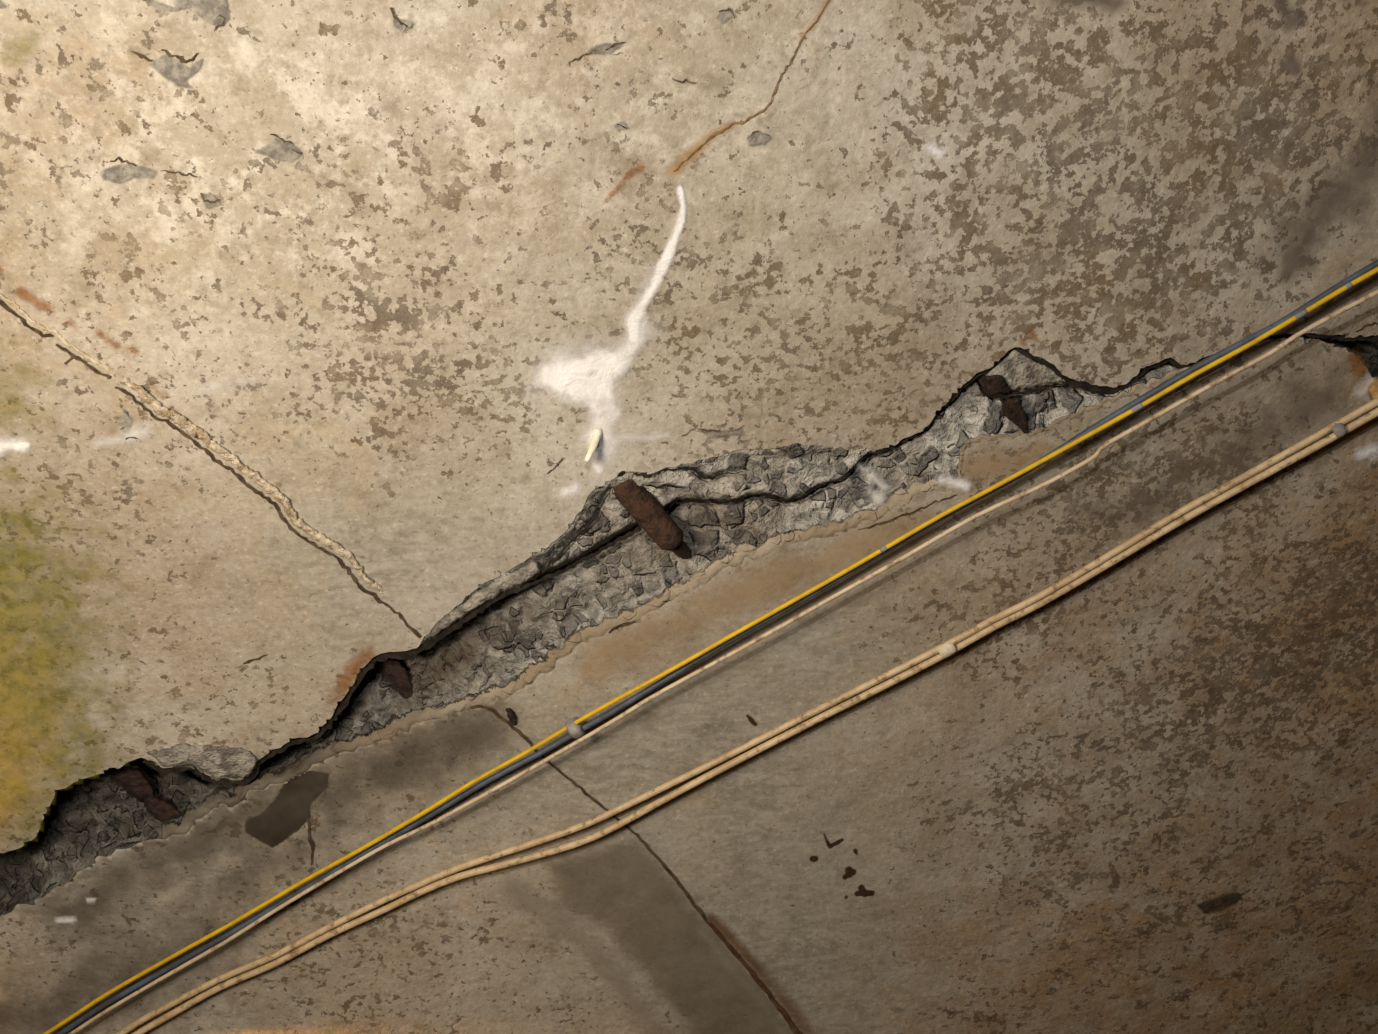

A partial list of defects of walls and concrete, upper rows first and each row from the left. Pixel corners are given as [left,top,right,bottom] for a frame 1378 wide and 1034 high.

crack [673,0,829,172]
leakage [535,186,686,474]
spalling [681,425,744,438]
rust [979,374,1029,434]
leakage [561,484,579,496]
crack [0,294,1378,1034]
peeling [506,708,517,726]
rust [110,768,182,822]